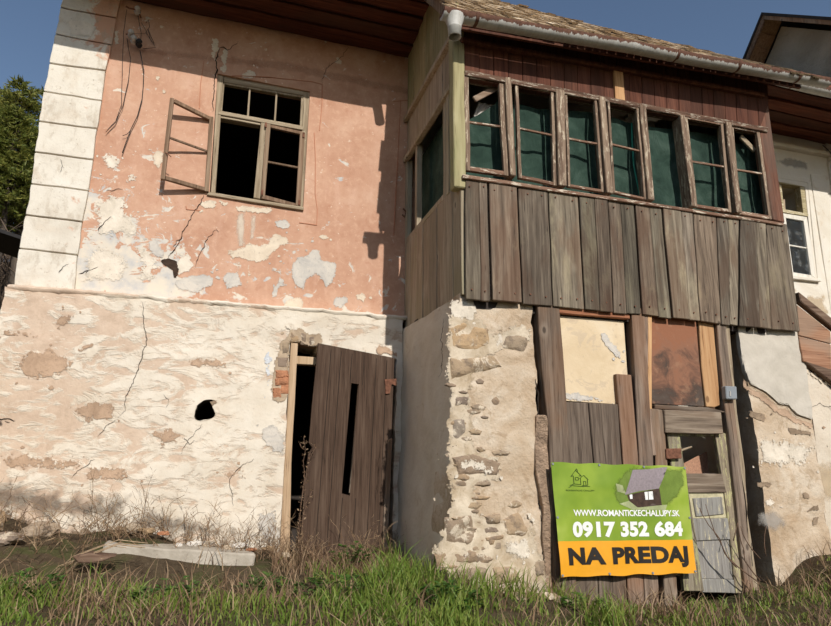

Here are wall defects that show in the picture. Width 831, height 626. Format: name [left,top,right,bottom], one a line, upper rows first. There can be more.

crack [212,44,236,105]
peeling [96,146,124,175]
peeling [148,149,163,168]
crack [168,195,204,258]
peeling [80,174,337,308]
peeling [329,293,372,309]
crack [99,307,147,435]
flaking render [264,328,330,403]
peeling [743,379,816,469]